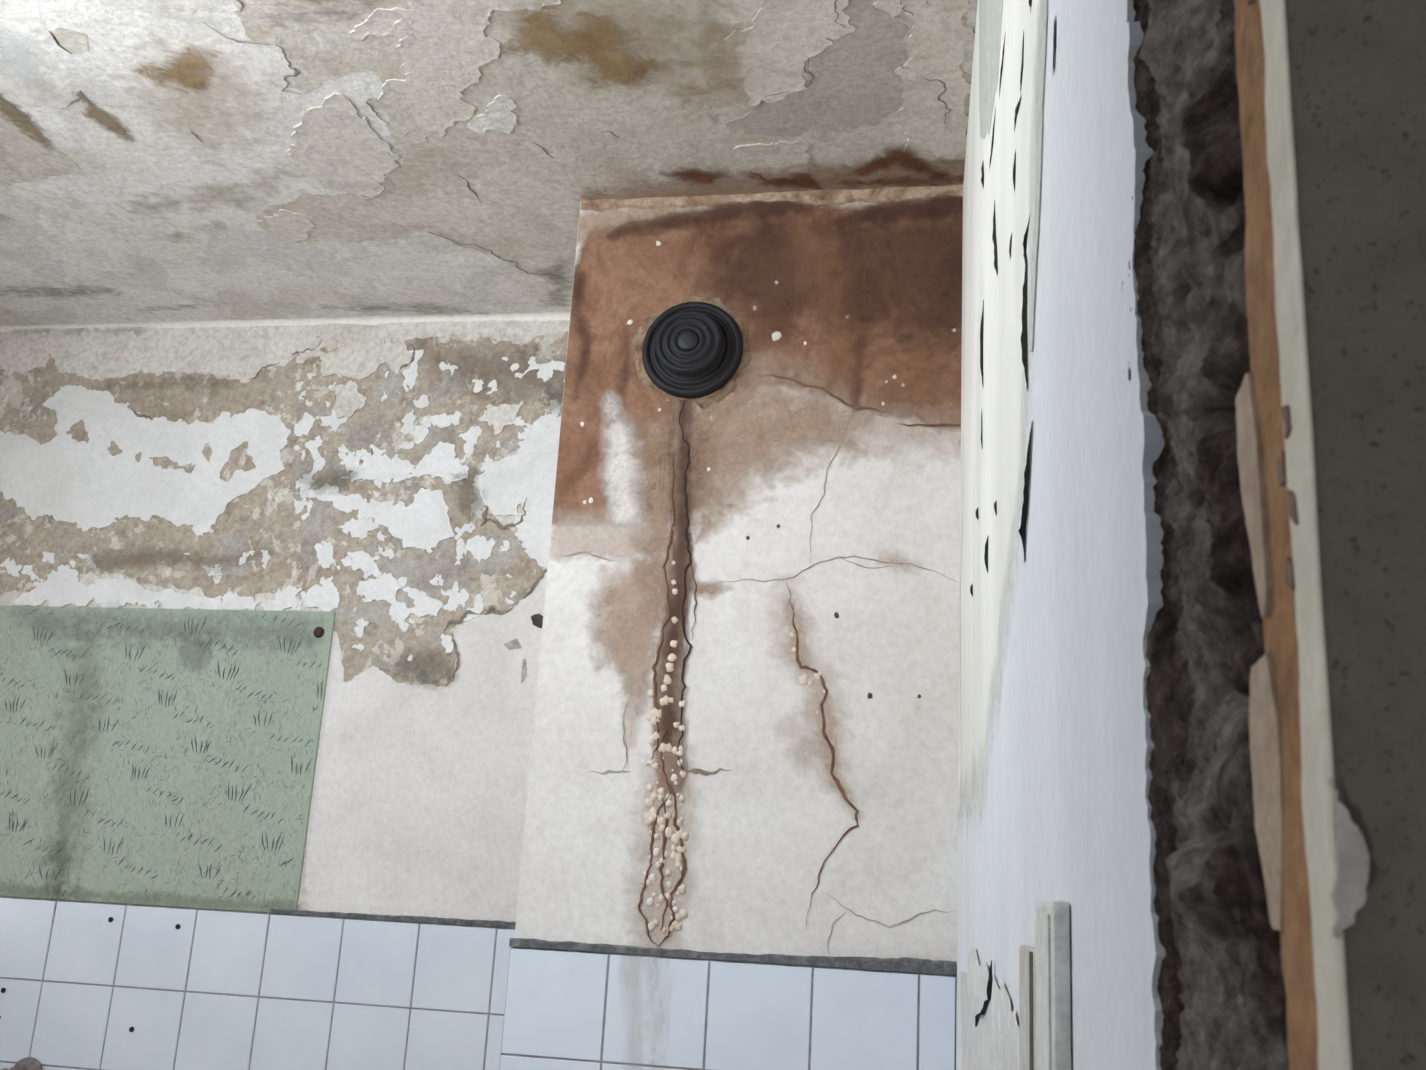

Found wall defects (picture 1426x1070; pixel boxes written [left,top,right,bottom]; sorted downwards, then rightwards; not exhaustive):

peeling [49,28,89,54]
peeling [0,95,81,186]
peeling [0,330,569,687]
peeling [202,0,1048,813]
crack [687,0,1055,952]
peeling [1276,405,1299,524]
peeling [1284,558,1295,590]
spalling [1326,776,1377,937]